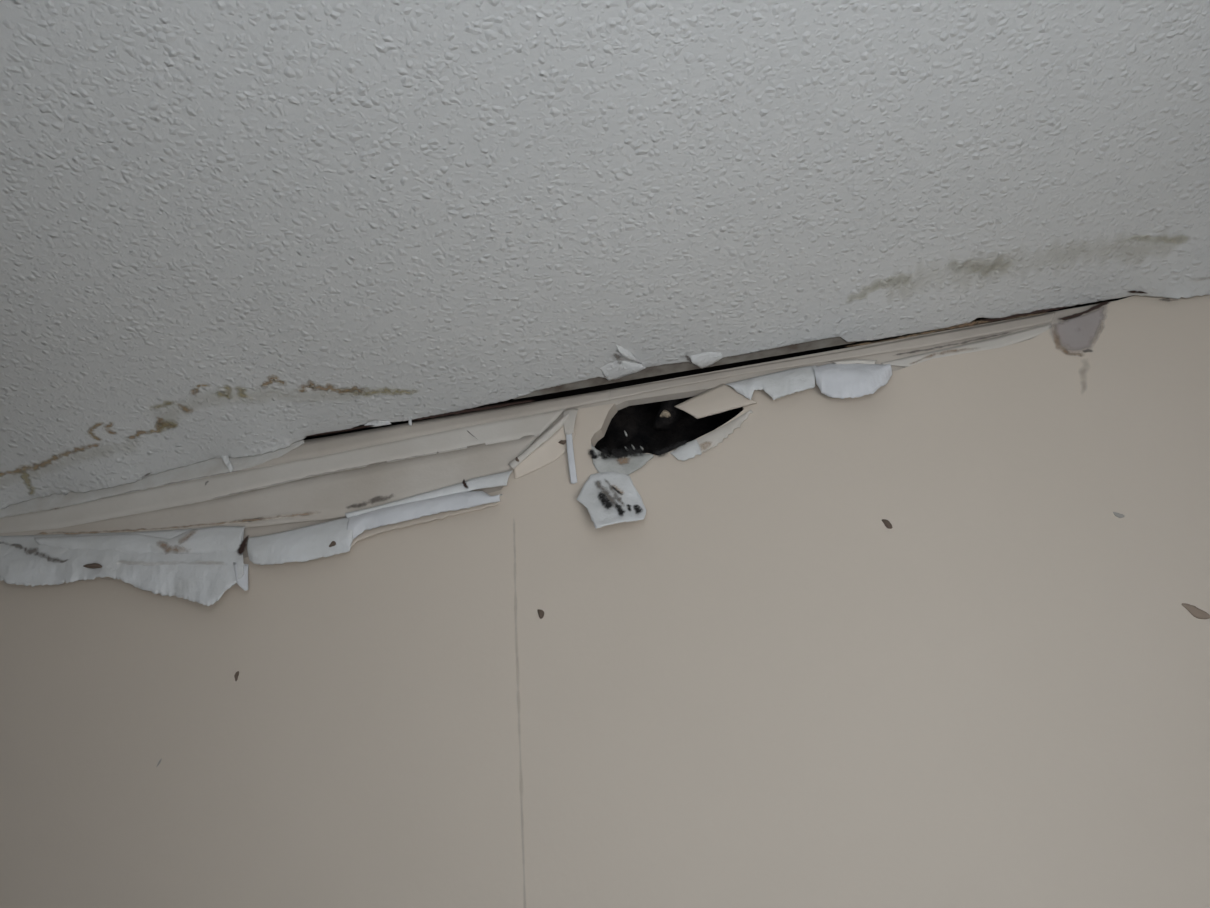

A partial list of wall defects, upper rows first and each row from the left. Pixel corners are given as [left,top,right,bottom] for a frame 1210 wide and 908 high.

water stain [0,403,190,494]
water stain [299,382,410,395]
peeling [0,295,1134,606]
crack [305,291,1172,437]